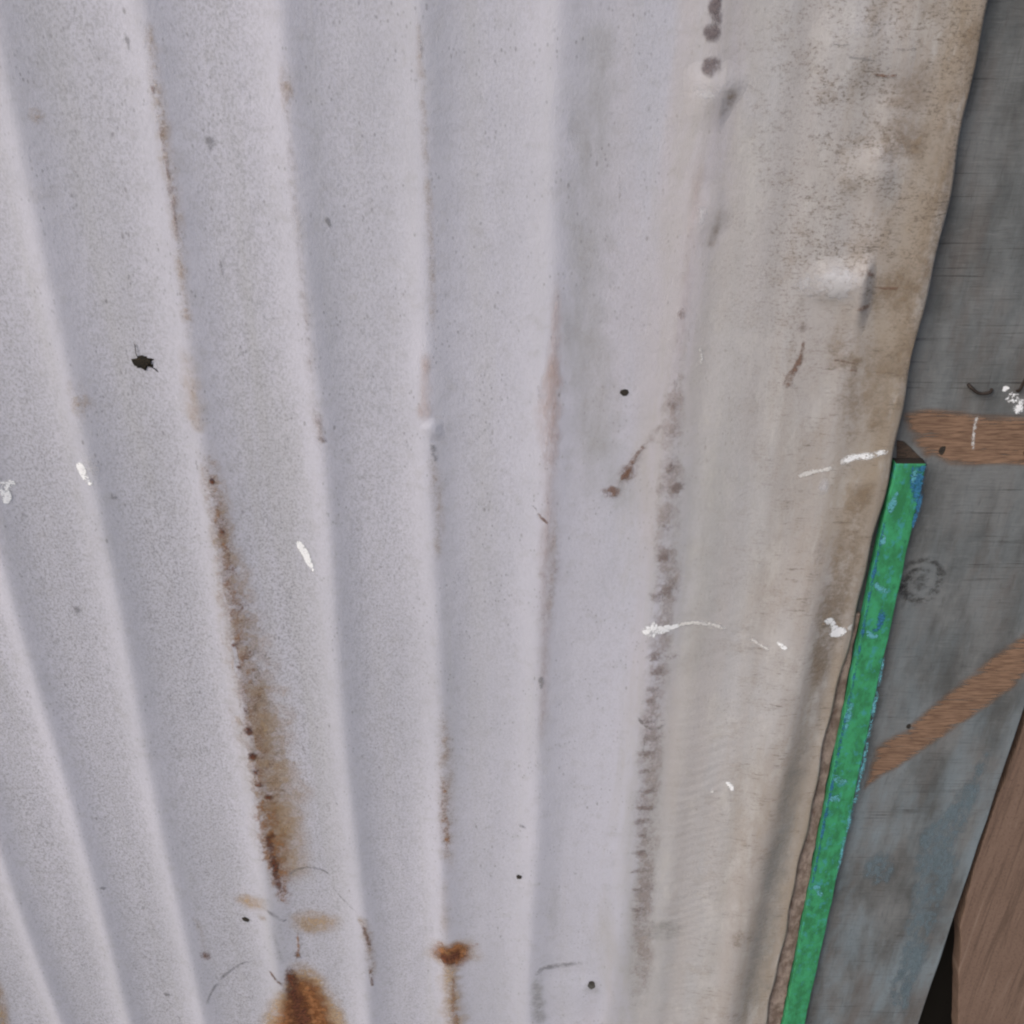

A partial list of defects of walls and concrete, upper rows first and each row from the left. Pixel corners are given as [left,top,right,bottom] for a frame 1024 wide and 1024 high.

corrosion [608,446,643,496]
corrosion [232,634,288,901]
corrosion [267,970,342,1024]
corrosion [437,943,467,1024]